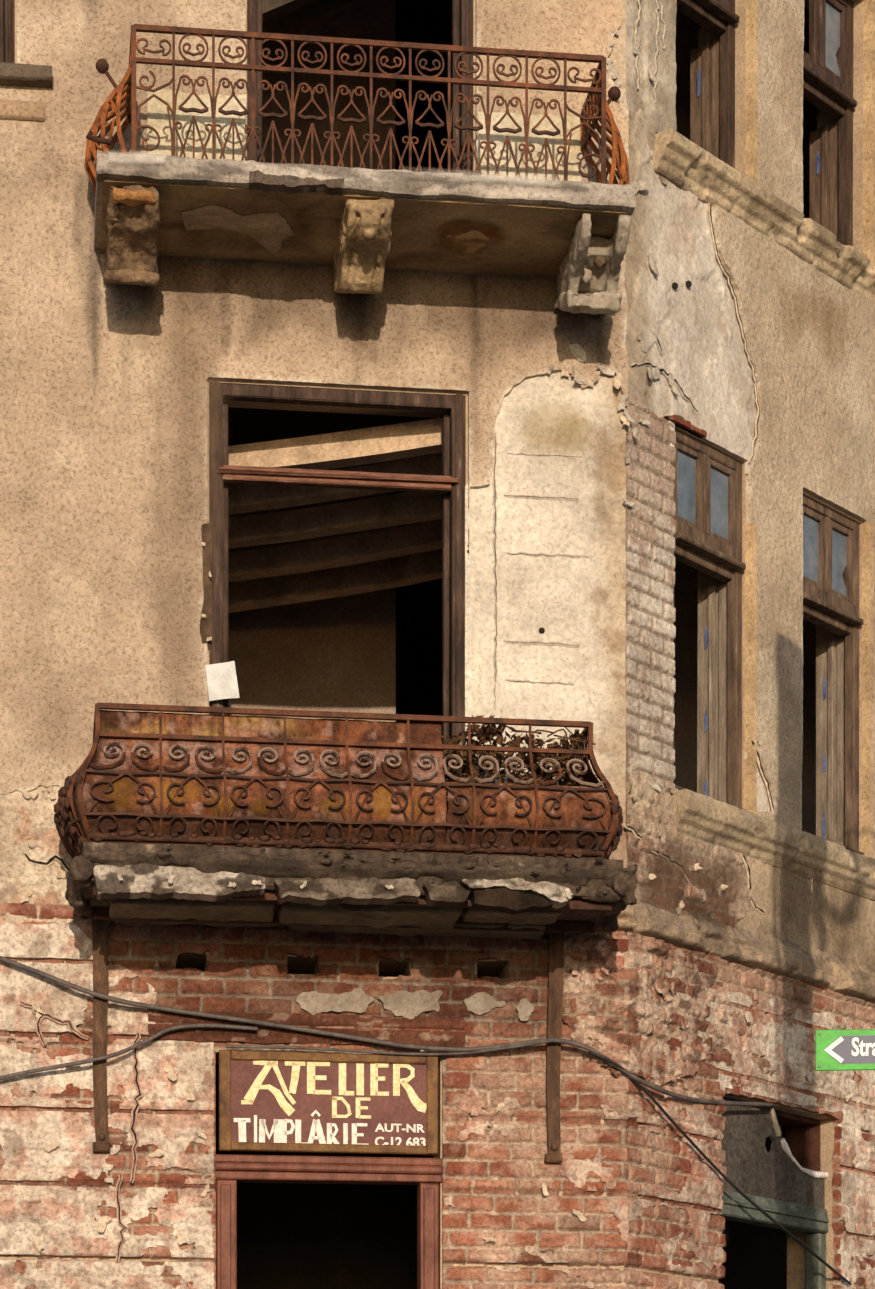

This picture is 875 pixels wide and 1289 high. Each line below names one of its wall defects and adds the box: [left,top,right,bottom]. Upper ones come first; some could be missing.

spalling [248,170,344,195]
spalling [180,204,295,253]
spalling [447,230,490,253]
peeling [456,0,875,1289]
crack [741,854,766,915]
peeling [0,784,573,1289]